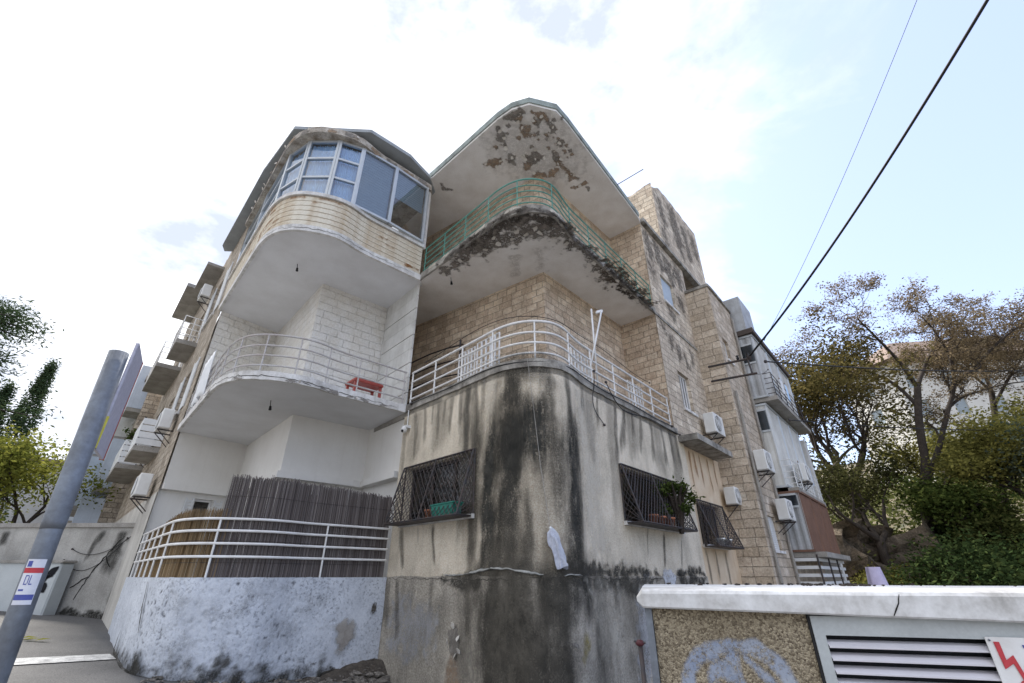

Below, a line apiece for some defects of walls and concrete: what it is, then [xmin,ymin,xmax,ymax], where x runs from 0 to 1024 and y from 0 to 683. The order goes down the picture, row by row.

peeling [483,107,590,191]
spalling [429,253,452,276]
leakage [443,200,698,370]
leakage [443,354,666,683]
leakage [677,552,732,585]
leakage [336,618,355,652]